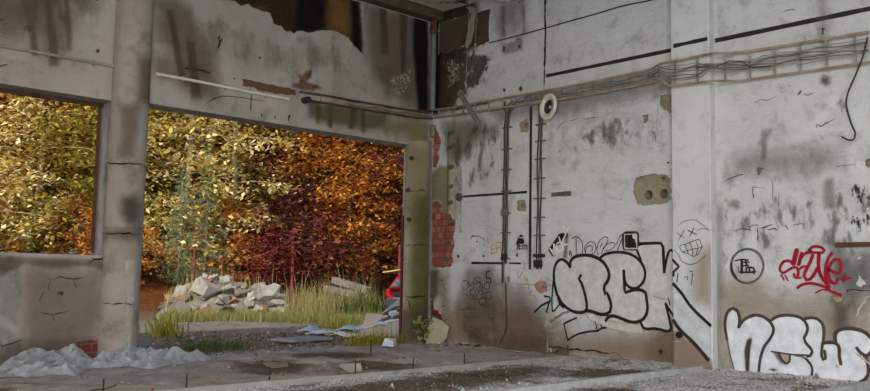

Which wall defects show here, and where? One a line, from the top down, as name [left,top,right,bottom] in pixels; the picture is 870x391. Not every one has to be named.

flaking render [232,0,364,54]
peeling [438,6,490,101]
flaking render [431,166,462,268]
flaking render [632,173,672,206]
crack [39,257,103,320]
flaking render [73,340,98,358]